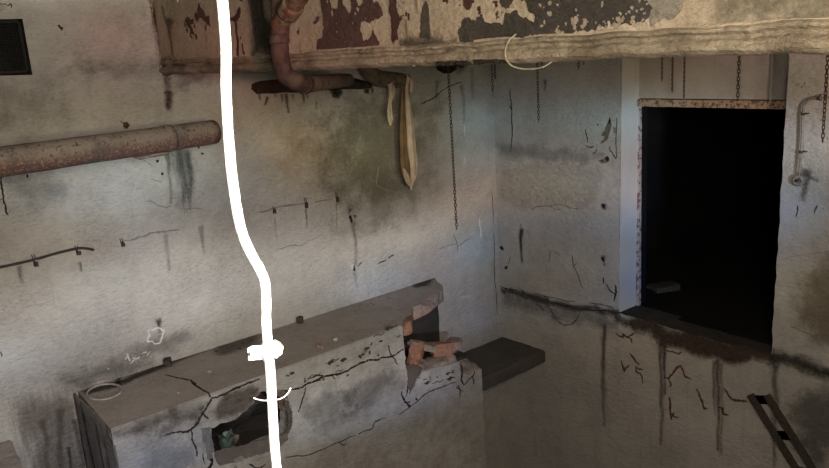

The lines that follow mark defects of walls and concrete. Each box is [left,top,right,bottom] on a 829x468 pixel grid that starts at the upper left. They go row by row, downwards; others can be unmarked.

peeling [314,0,410,50]
peeling [420,1,431,39]
peeling [458,0,684,42]
crack [0,178,8,215]
crack [494,242,643,384]
crack [164,374,260,468]
flaking render [201,400,293,465]
crack [285,345,475,458]
spalling [406,338,462,390]
crack [664,350,748,420]